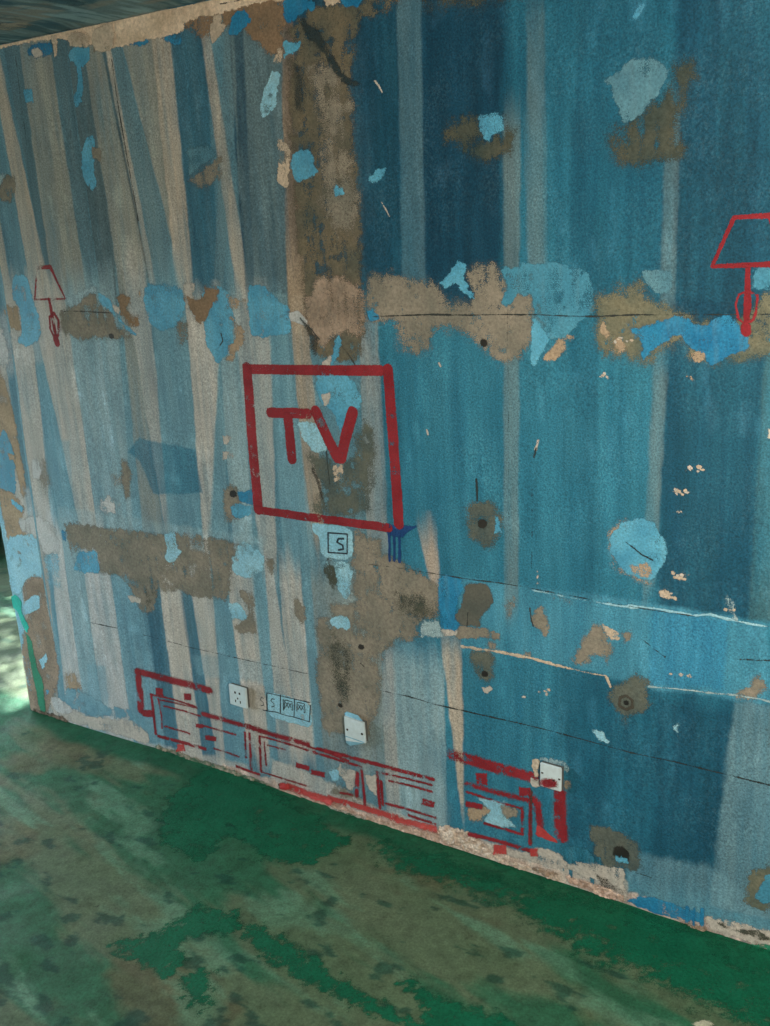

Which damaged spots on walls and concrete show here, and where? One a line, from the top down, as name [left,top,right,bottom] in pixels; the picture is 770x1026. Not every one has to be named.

peeling [81,135,101,192]
flaking render [162,0,770,738]
crack [374,313,770,334]
peeling [0,274,770,1026]
crack [383,691,770,786]